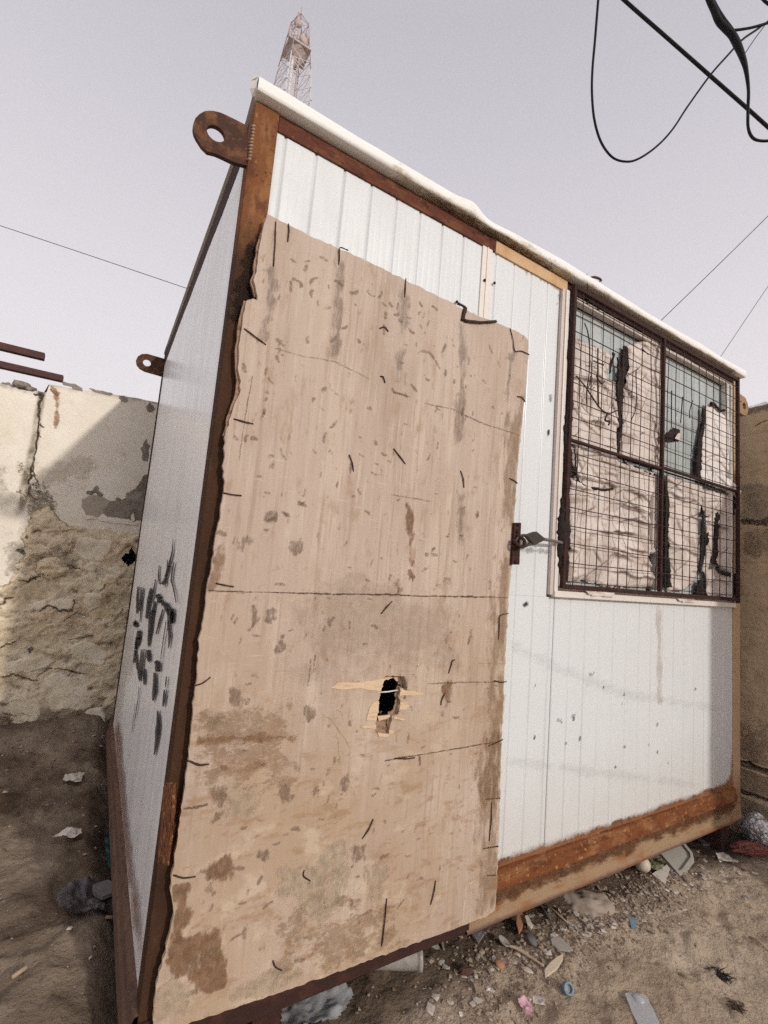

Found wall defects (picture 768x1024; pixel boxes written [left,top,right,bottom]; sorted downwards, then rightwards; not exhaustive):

crack [27,389,58,498]
flaking render [0,439,150,727]
rust [115,724,139,935]
rust [498,773,733,867]
rust [496,802,736,903]